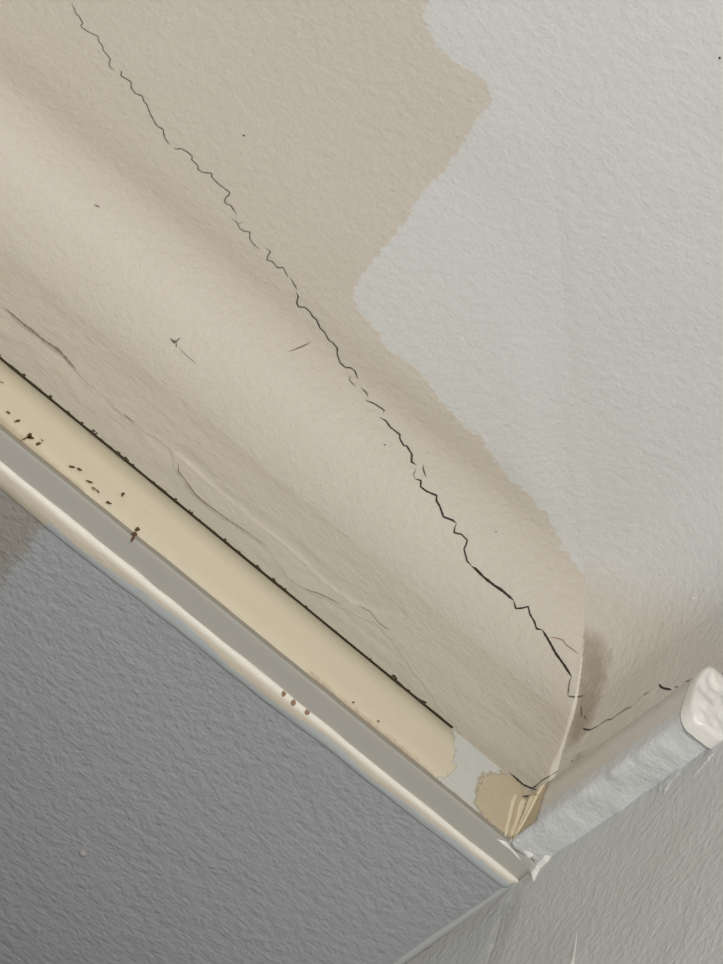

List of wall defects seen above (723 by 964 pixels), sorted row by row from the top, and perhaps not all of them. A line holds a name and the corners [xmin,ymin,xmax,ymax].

crack [72,5,691,731]